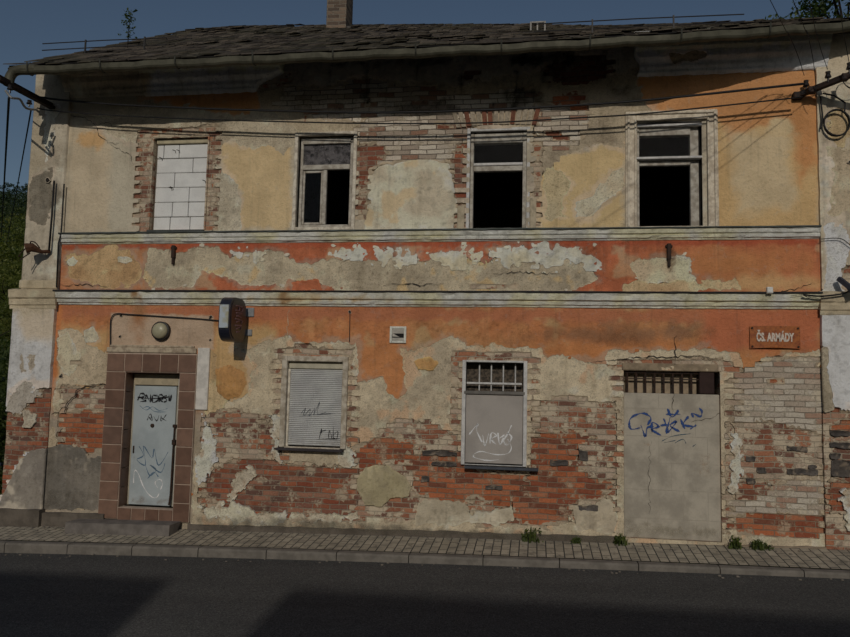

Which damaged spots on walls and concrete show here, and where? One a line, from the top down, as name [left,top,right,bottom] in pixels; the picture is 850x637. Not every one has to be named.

peeling [94,67,651,232]
peeling [65,241,602,291]
peeling [622,252,741,292]
crack [51,383,106,415]
peeling [191,335,850,550]